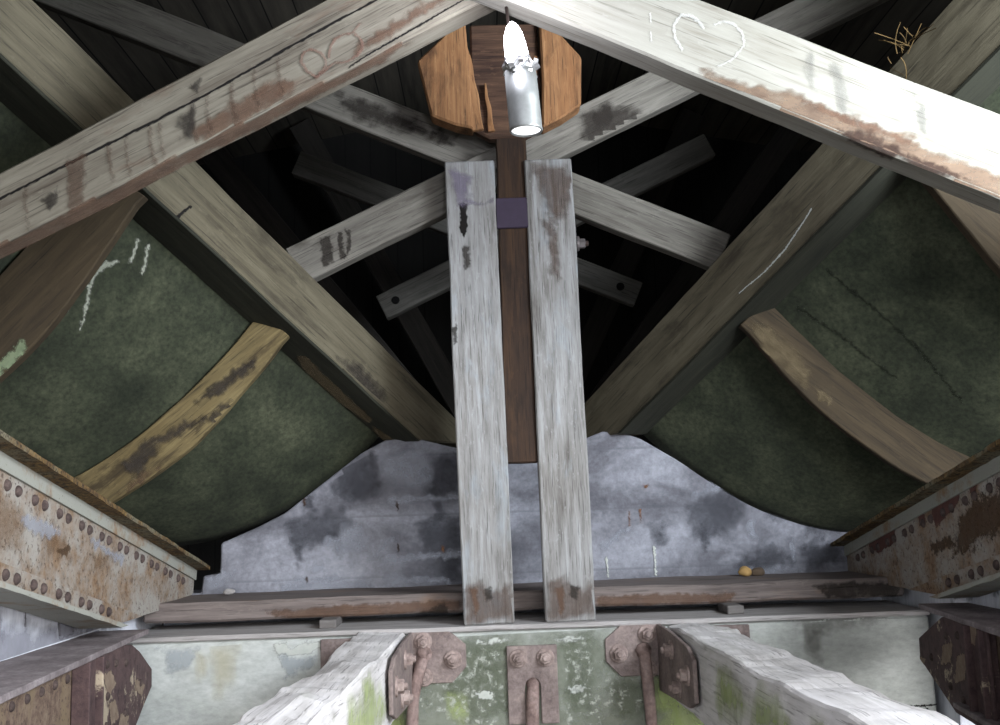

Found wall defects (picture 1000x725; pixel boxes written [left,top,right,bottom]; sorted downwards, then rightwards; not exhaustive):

damp [289,497,352,560]
damp [421,458,460,574]
damp [692,496,734,545]
damp [801,546,839,566]
rust [918,485,1000,559]